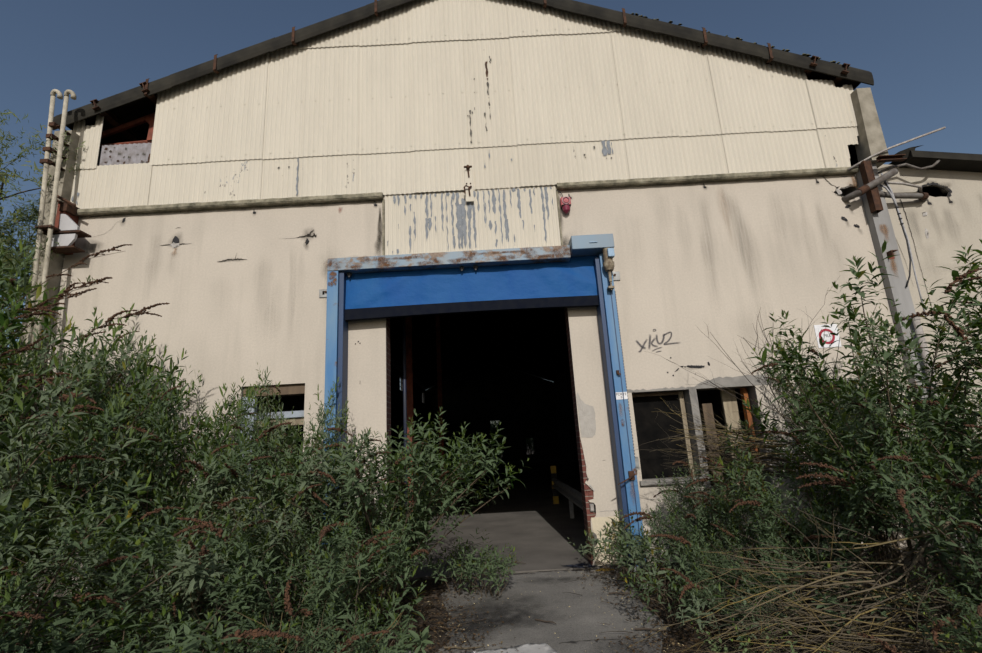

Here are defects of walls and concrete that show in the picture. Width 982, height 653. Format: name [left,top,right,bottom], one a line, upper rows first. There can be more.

peeling [573,140,613,159]
peeling [387,186,554,253]
rust [350,256,440,269]
rust [454,248,568,263]